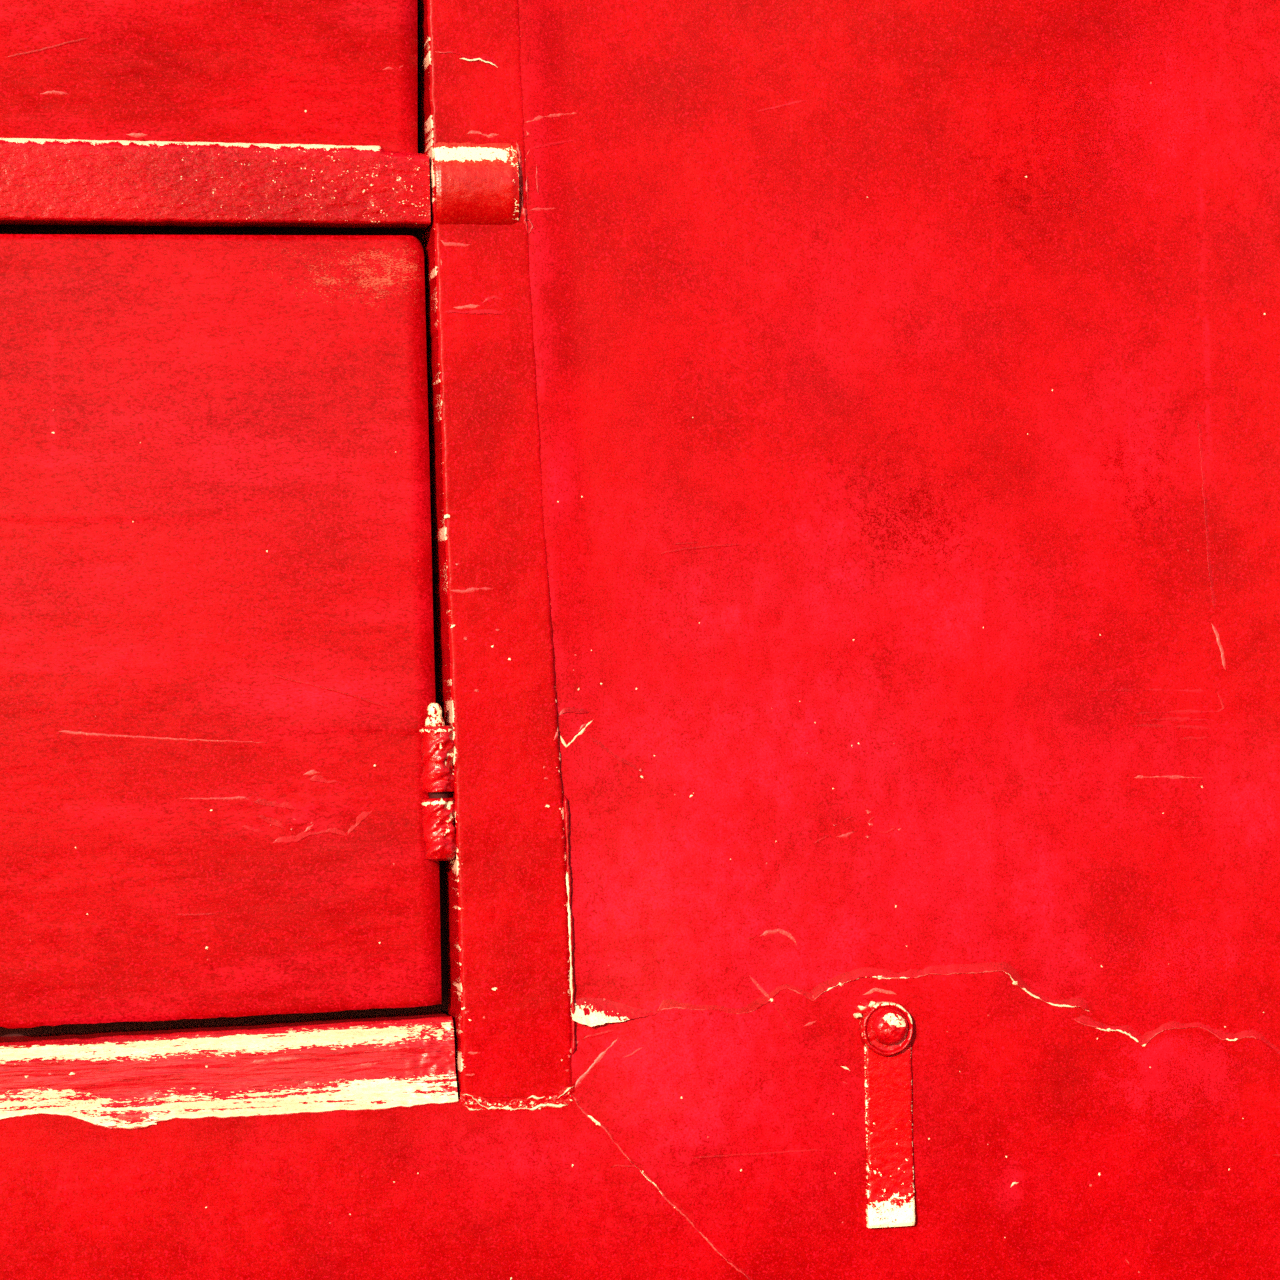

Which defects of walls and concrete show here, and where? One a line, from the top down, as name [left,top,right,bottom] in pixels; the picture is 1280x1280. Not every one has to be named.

peeling [0,992,662,1129]
crack [563,794,753,1280]
crack [657,962,1280,1055]